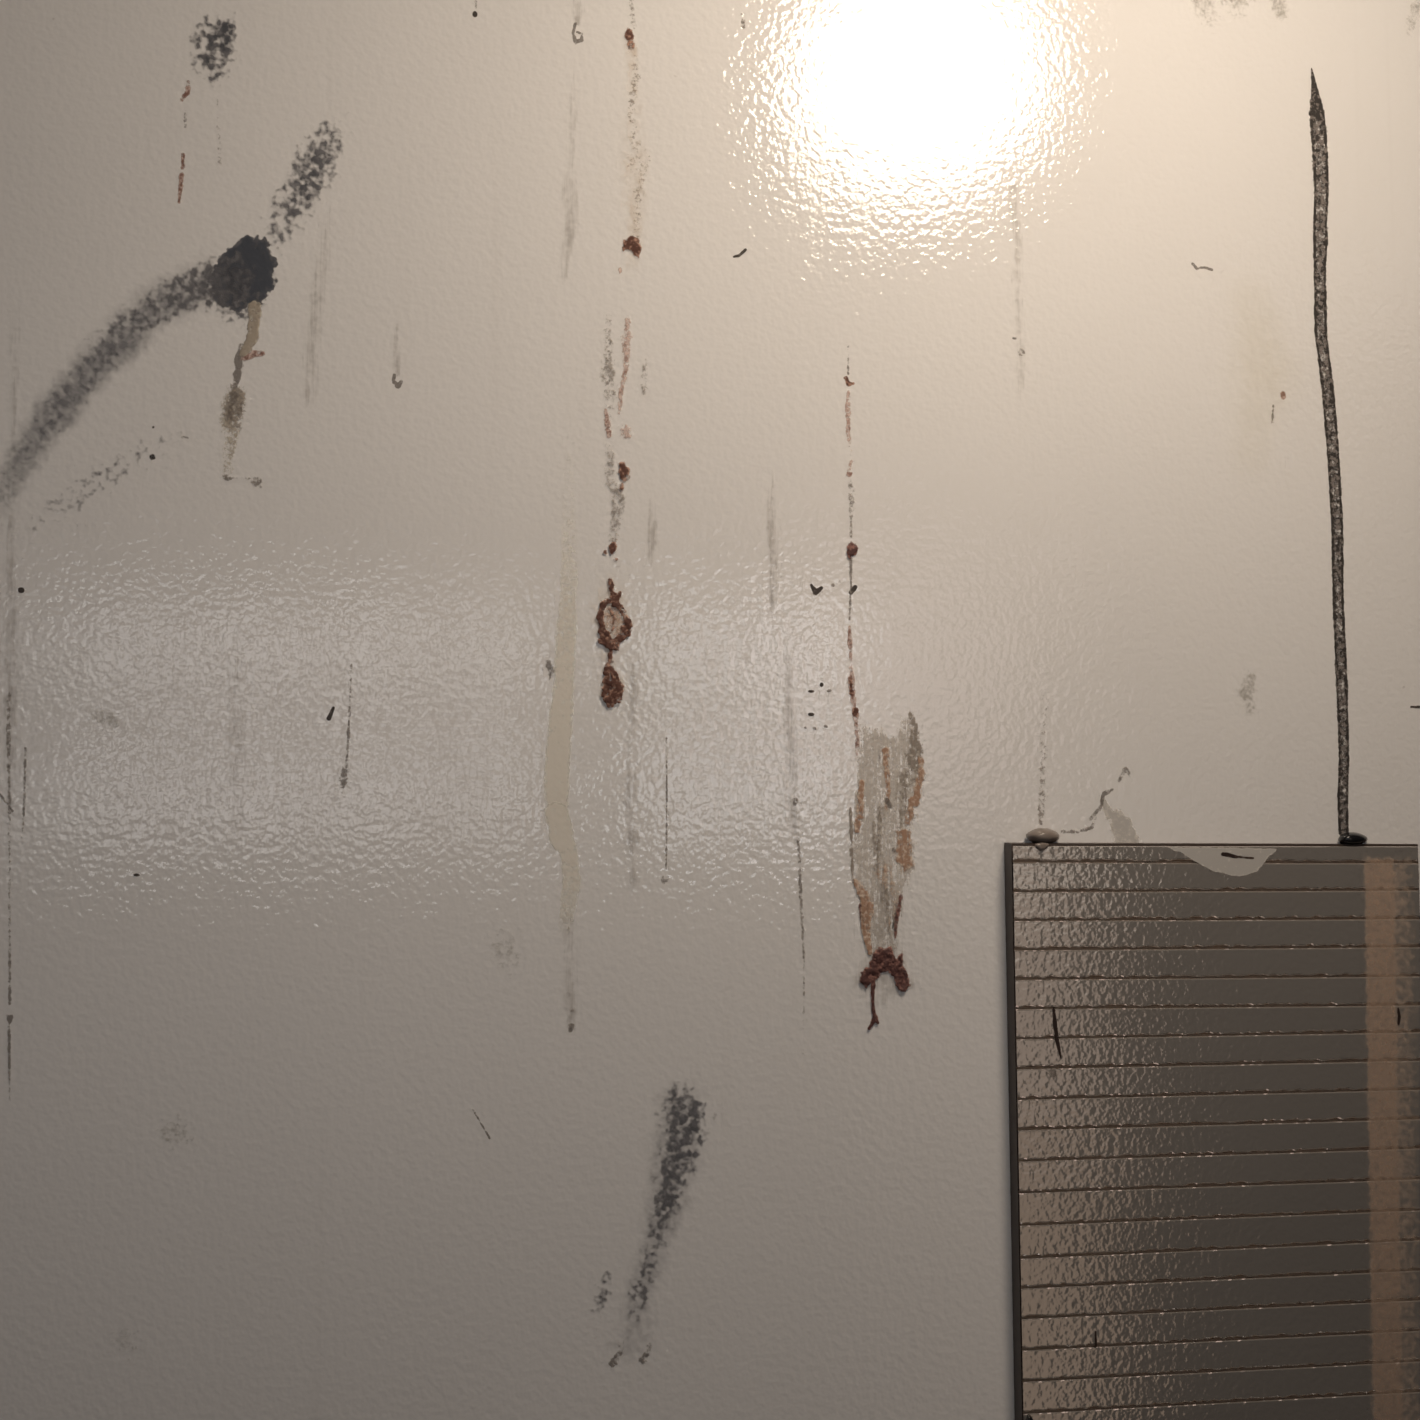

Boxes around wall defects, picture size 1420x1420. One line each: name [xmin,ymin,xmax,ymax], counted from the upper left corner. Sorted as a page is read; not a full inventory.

rust [625,8,636,65]
rust [622,236,642,258]
water stain [222,301,265,480]
rust [602,318,645,561]
rust [844,366,855,441]
rust [596,578,633,708]
rust [846,460,859,755]
water stain [544,557,580,918]
peeling [849,712,925,1030]